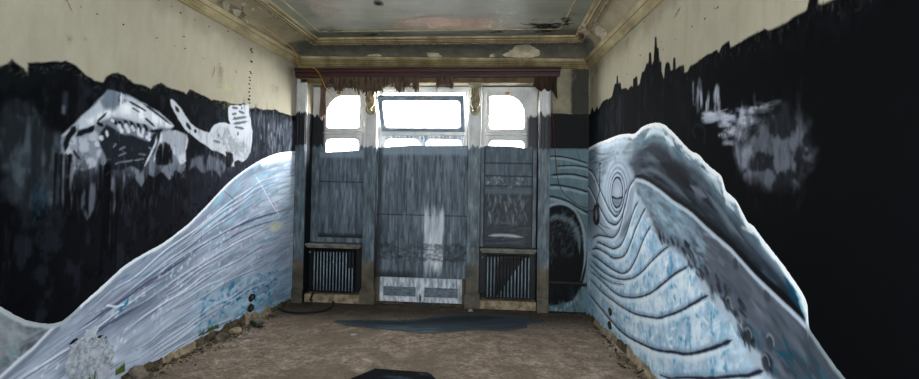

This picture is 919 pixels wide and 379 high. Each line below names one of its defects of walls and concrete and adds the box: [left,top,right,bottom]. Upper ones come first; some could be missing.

spalling [64,326,132,379]
flaking render [143,294,292,371]